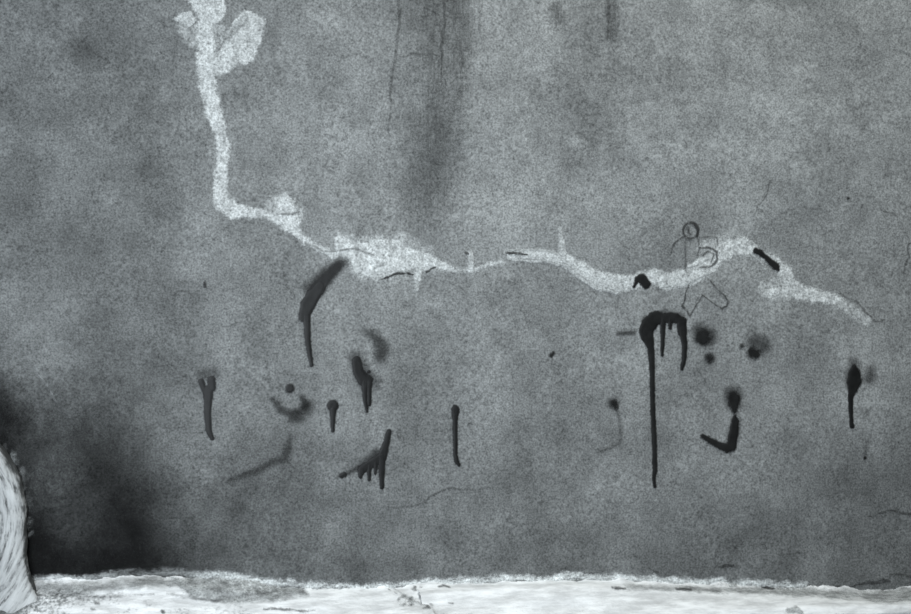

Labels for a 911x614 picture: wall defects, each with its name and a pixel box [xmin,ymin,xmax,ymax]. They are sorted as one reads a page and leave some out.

crack [174,0,871,325]